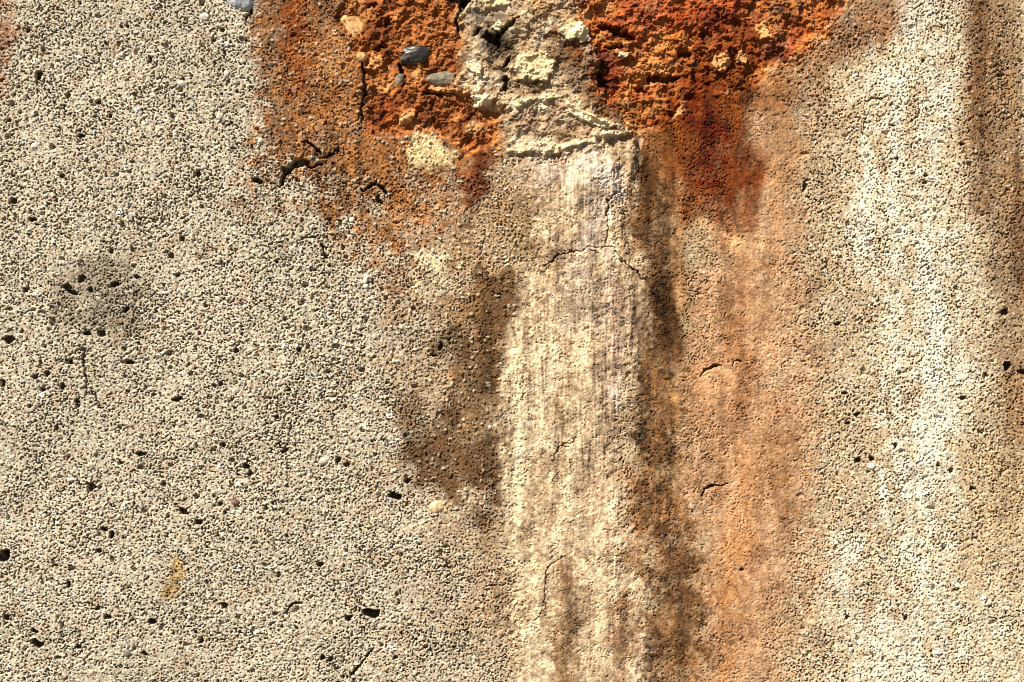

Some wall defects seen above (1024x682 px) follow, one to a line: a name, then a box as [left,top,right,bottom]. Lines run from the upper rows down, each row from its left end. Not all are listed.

crack [280,139,340,188]
corrosion [223,0,508,337]
peeling [326,0,858,176]
crack [544,192,644,279]
leakage [387,137,723,682]